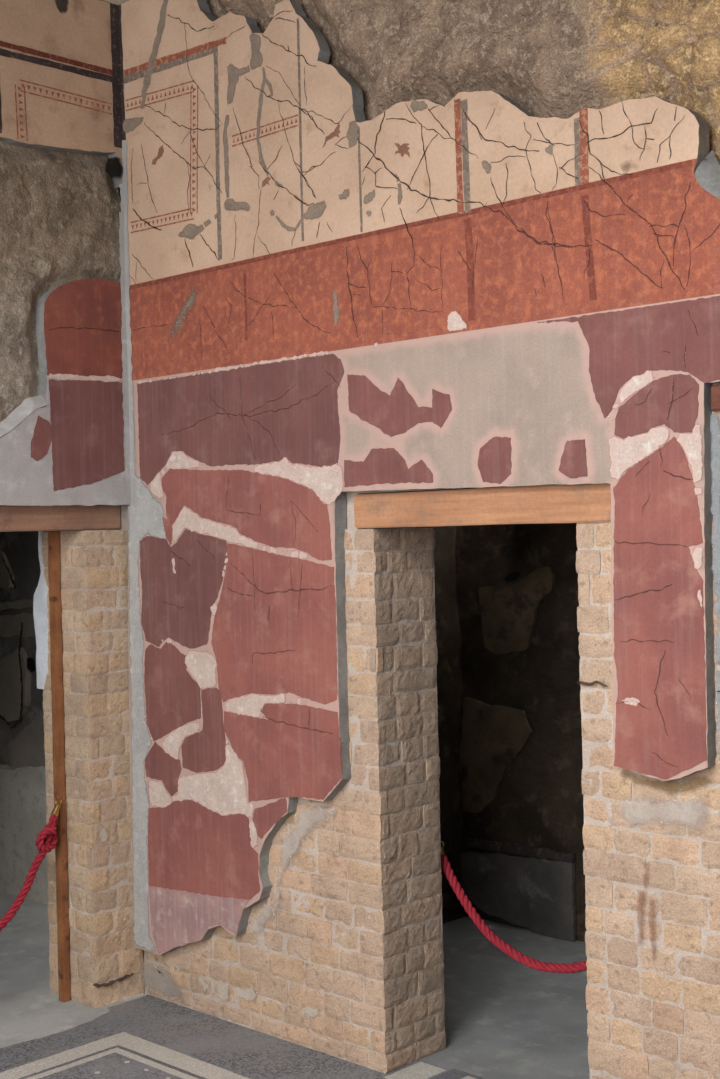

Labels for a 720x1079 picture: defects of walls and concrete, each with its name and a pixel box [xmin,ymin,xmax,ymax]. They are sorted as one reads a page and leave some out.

flaking render [296,0,720,164]
crack [131,0,720,420]
flaking render [0,141,123,422]
peeling [137,351,329,384]
crack [161,367,340,460]
crack [636,446,693,515]
crack [170,501,332,619]
crack [615,540,687,548]
peeling [162,722,200,759]
peeling [149,739,257,848]
peeling [225,693,301,718]
crack [577,639,691,767]